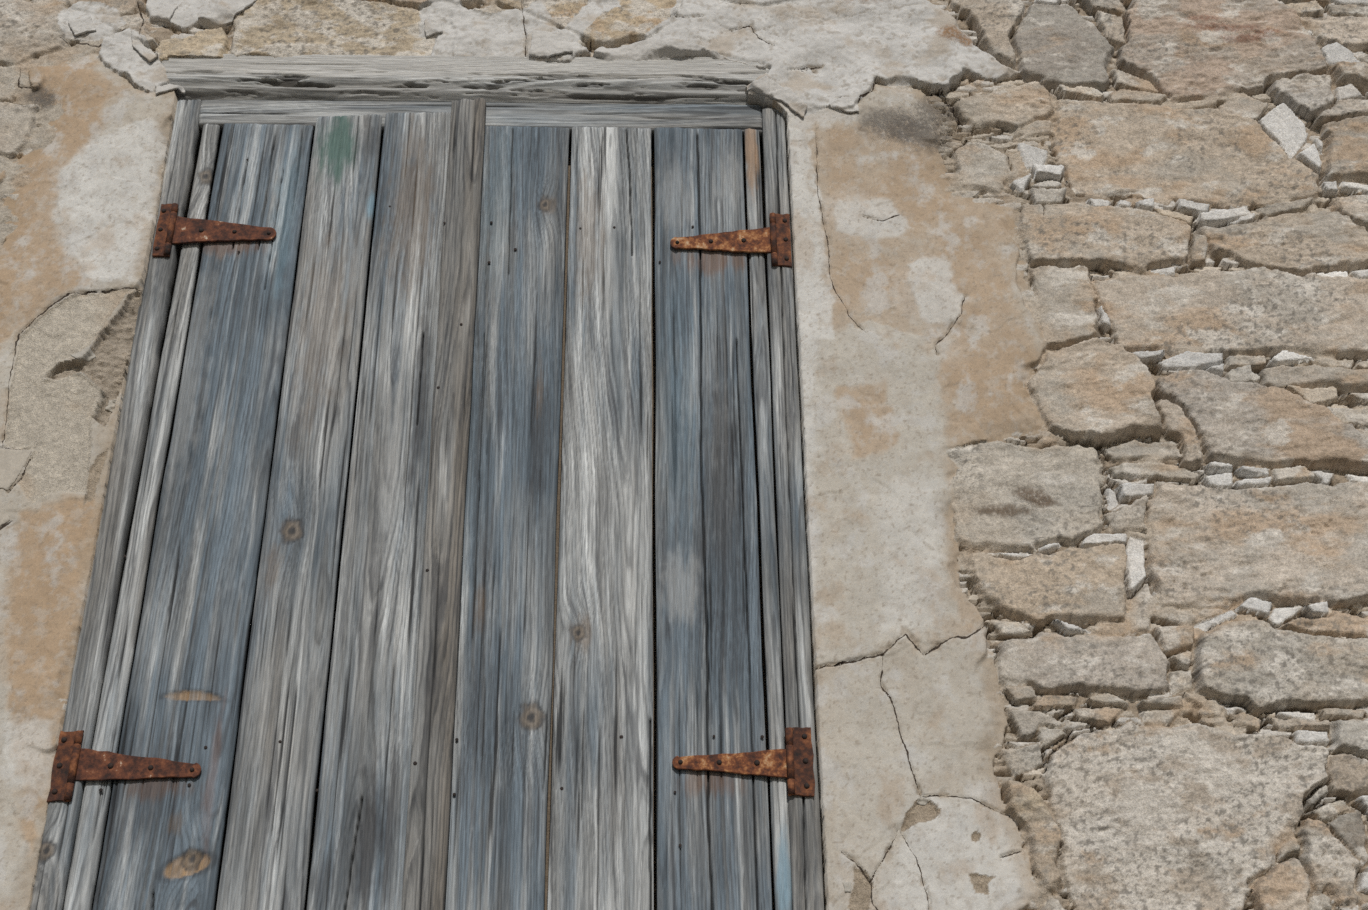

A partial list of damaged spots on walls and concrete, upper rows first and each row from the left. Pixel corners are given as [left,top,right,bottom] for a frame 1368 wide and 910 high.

crack [815,133,863,330]
crack [0,287,139,529]
flaking render [0,288,143,505]
crack [817,626,1008,816]
crack [841,829,929,910]